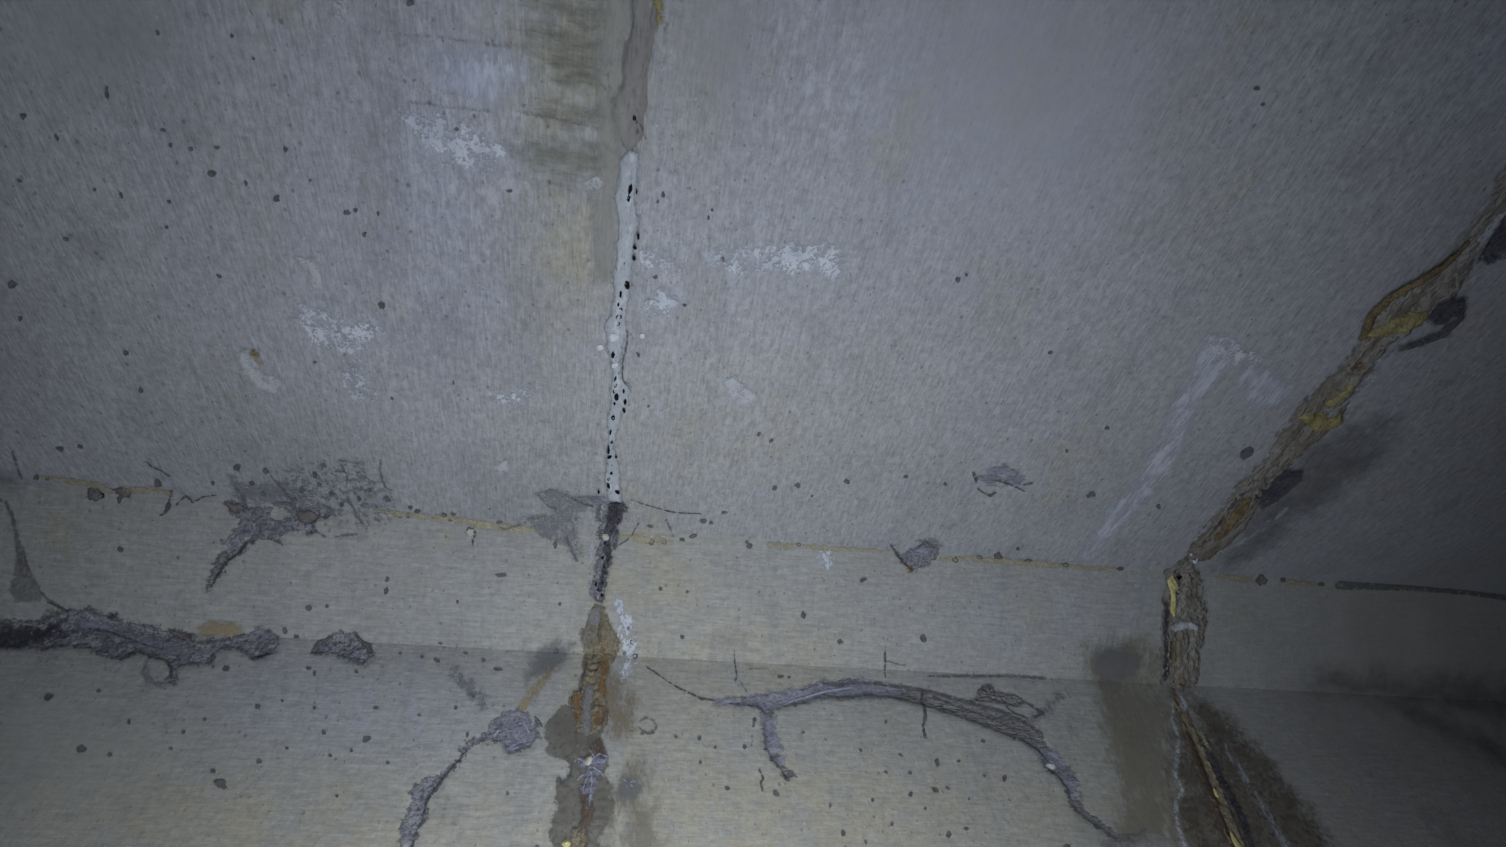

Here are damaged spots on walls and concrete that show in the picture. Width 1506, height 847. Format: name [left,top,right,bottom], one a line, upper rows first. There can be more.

crack [0,453,69,613]
crack [144,461,216,516]
spalling [206,463,396,593]
spalling [310,630,375,665]
rust [568,604,634,736]
crack [619,499,701,545]
crack [647,651,761,727]
water stain [939,175,1506,847]
crack [1335,581,1506,600]
crack [398,707,543,847]
water stain [544,705,652,847]